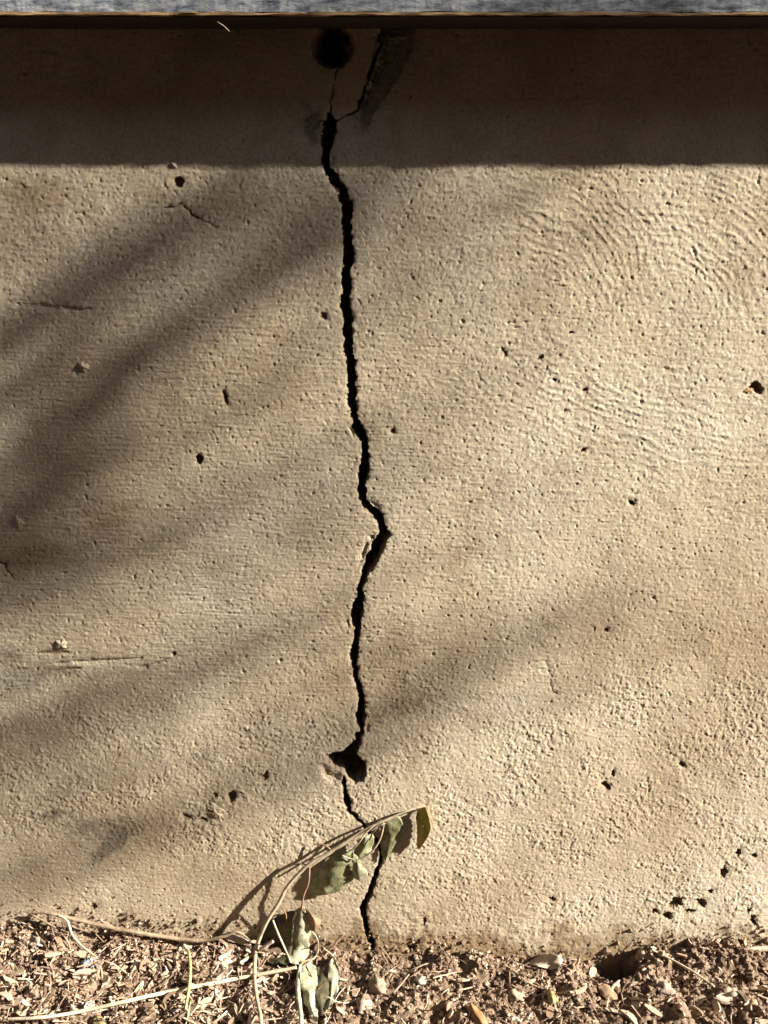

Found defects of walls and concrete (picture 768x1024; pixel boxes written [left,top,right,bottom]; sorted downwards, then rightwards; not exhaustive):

crack [310,29,417,750]
crack [341,774,384,954]